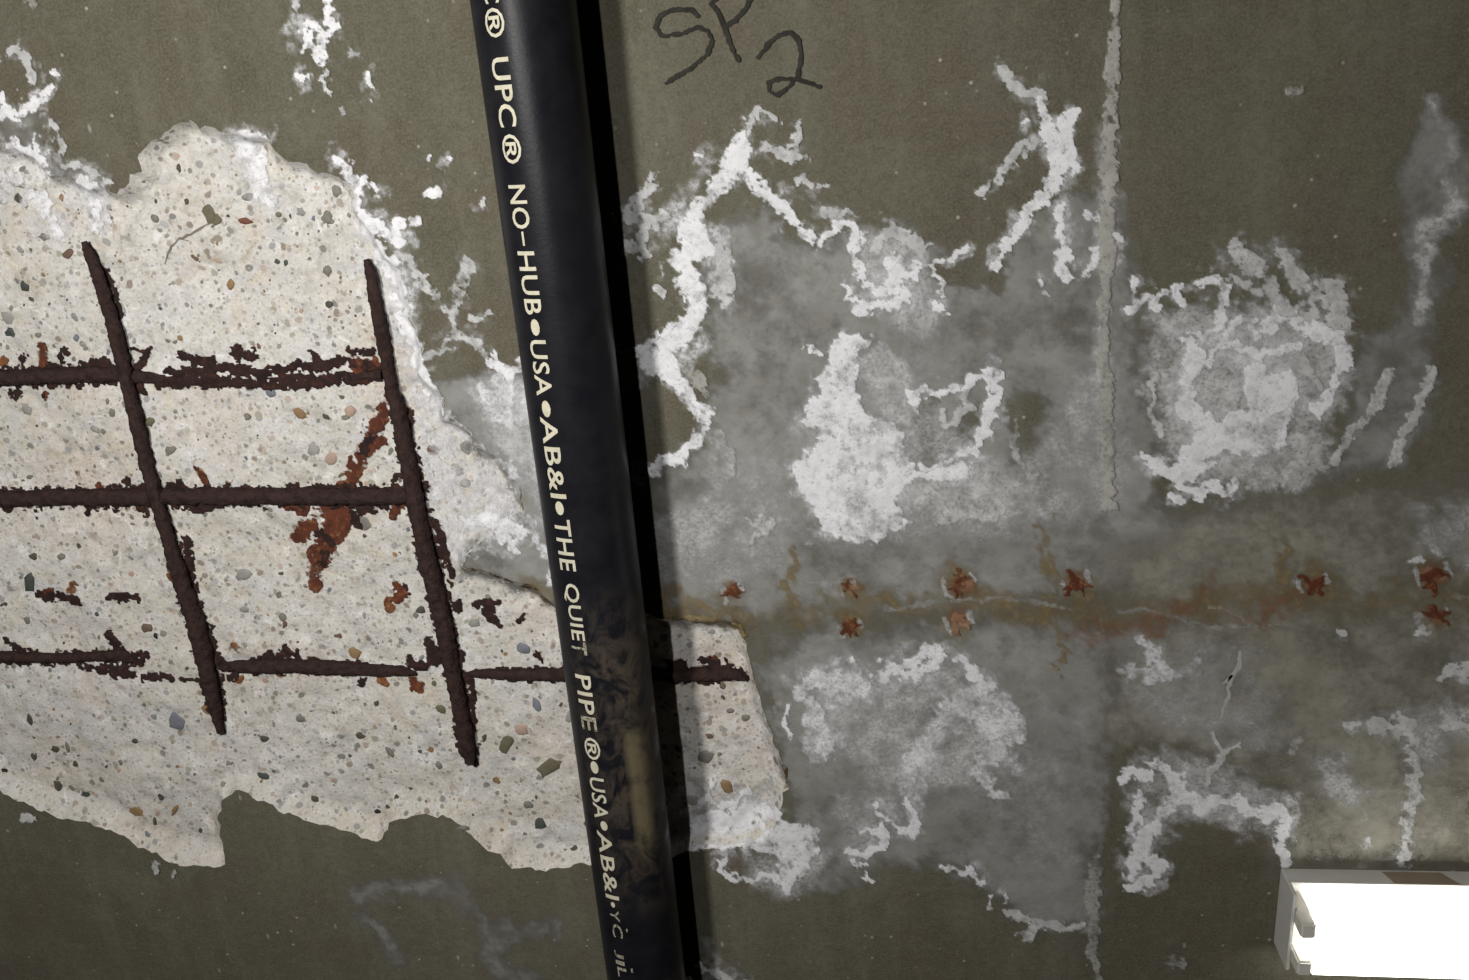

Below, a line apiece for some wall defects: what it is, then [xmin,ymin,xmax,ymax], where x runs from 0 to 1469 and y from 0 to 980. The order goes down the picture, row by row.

water stain [221,128,278,211]
water stain [332,151,554,602]
rust [336,392,389,488]
rust [34,581,82,606]
spalling [0,120,591,872]
rust [290,506,363,593]
rust [384,581,411,613]
rust [471,598,526,629]
crack [461,567,555,607]
crack [645,613,747,638]
water stain [616,65,1469,980]
spalling [645,614,789,858]